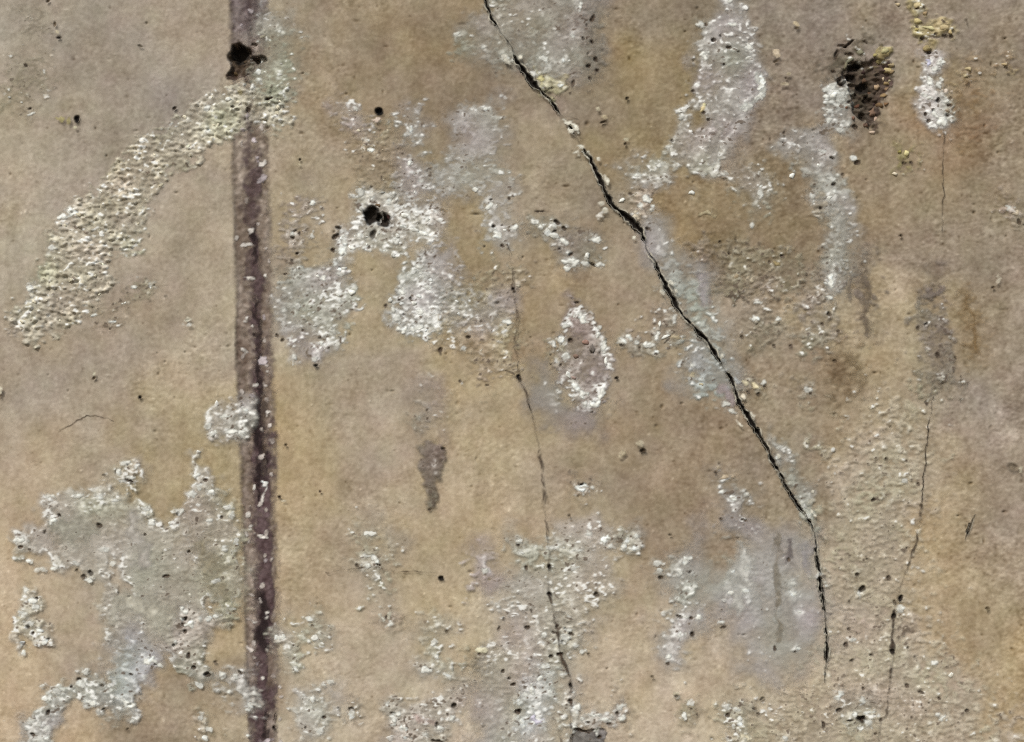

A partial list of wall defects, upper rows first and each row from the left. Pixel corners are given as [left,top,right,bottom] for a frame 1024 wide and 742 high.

spalling [822,37,895,134]
spalling [914,26,955,136]
peeling [244,107,532,385]
spalling [544,295,685,413]
crack [484,0,830,675]
peeling [204,384,287,446]
leakage [414,404,446,511]
peeling [8,450,276,721]
crack [547,564,572,739]
spalling [536,613,589,669]
crack [886,596,902,712]
spalling [562,690,630,739]